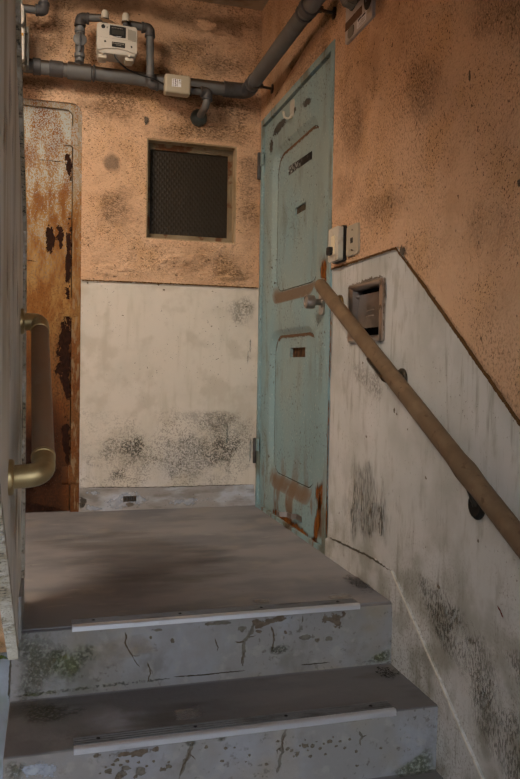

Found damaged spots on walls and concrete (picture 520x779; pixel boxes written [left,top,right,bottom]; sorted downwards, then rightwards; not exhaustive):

rust [65,154,73,181]
rust [46,218,72,299]
rust [54,316,72,400]
rust [61,416,71,465]
rust [25,470,60,513]
rust [273,436,328,542]
peeling [205,615,292,634]
peeling [299,611,346,642]
crack [124,633,152,681]
water stain [421,578,520,779]
spalling [93,746,172,779]